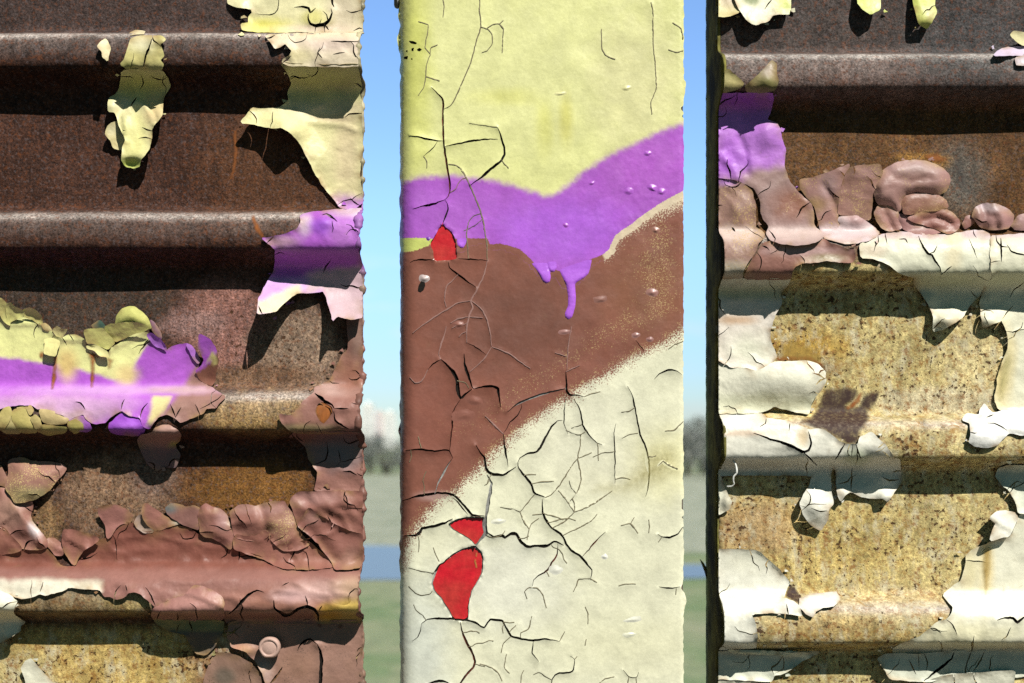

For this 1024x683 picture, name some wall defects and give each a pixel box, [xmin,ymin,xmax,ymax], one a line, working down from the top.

peeling [431,223,457,261]
peeling [0,0,363,683]
crack [403,0,684,683]
corrosion [778,345,821,365]
peeling [718,60,1024,531]
crack [754,431,853,466]
peeling [431,517,484,619]
peeling [718,546,840,683]
crack [924,652,954,681]
peeling [871,461,1024,683]
crack [998,616,1024,624]